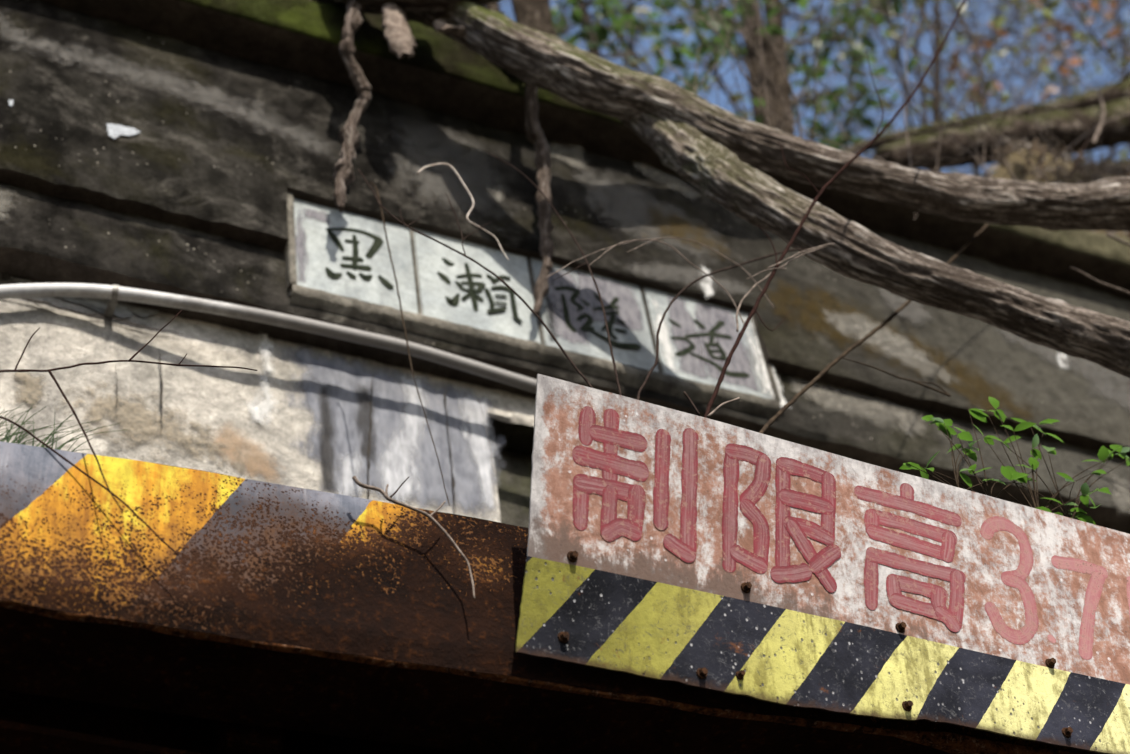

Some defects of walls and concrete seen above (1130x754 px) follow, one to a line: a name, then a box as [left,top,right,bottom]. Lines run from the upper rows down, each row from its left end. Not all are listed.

water stain [0,18,329,153]
water stain [248,333,502,514]